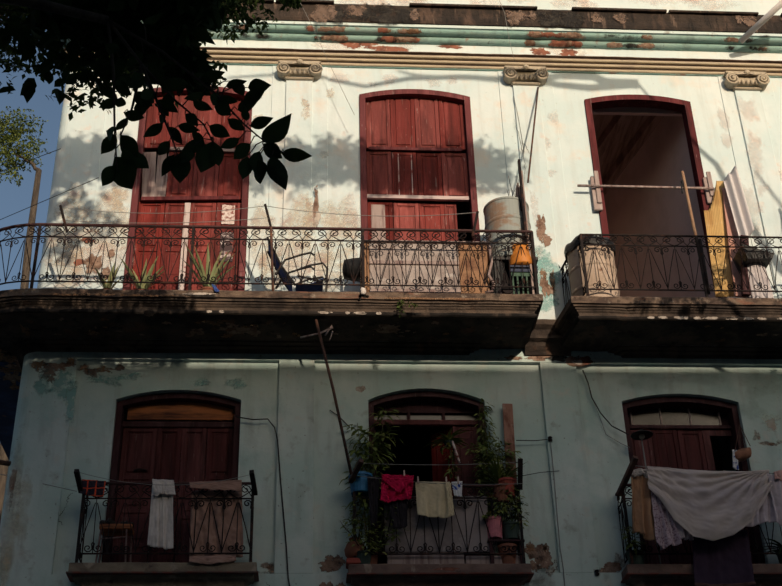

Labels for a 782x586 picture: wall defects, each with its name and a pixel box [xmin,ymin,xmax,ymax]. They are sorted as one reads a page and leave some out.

spalling [306,4,424,51]
peeling [524,31,583,56]
spalling [536,214,552,247]
spalling [540,268,555,297]
peeling [31,358,125,383]
spalling [318,555,346,586]
spalling [525,542,550,572]